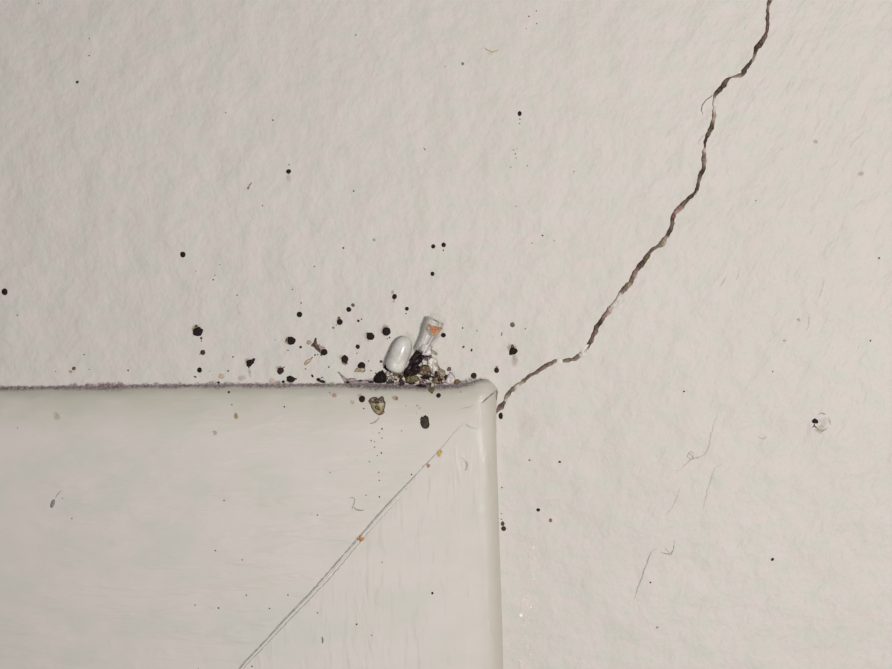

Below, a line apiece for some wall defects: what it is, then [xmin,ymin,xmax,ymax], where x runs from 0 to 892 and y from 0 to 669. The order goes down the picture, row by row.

crack [496,0,772,414]